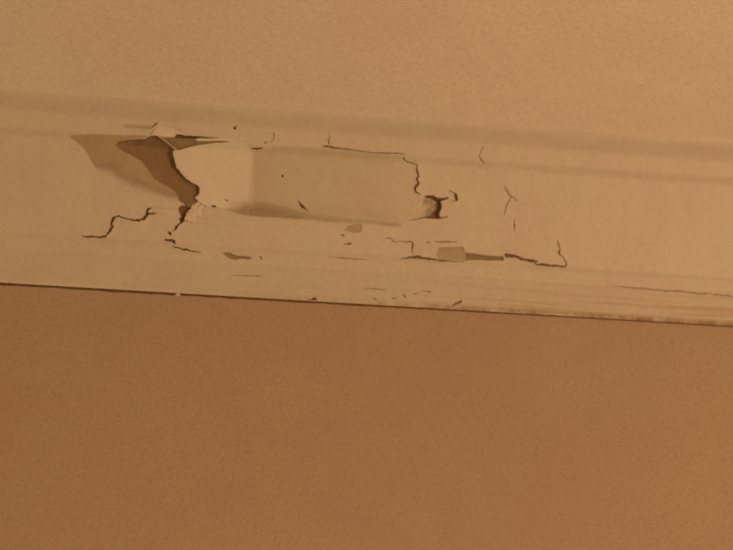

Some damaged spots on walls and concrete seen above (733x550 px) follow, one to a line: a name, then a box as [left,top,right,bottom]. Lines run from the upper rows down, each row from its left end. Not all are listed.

peeling [72,125,252,223]
crack [322,136,421,195]
crack [82,208,157,238]
crack [165,205,201,253]
crack [504,185,518,232]
peeling [223,252,251,260]
crack [386,237,463,262]
peeling [436,247,504,261]
crack [504,239,567,267]